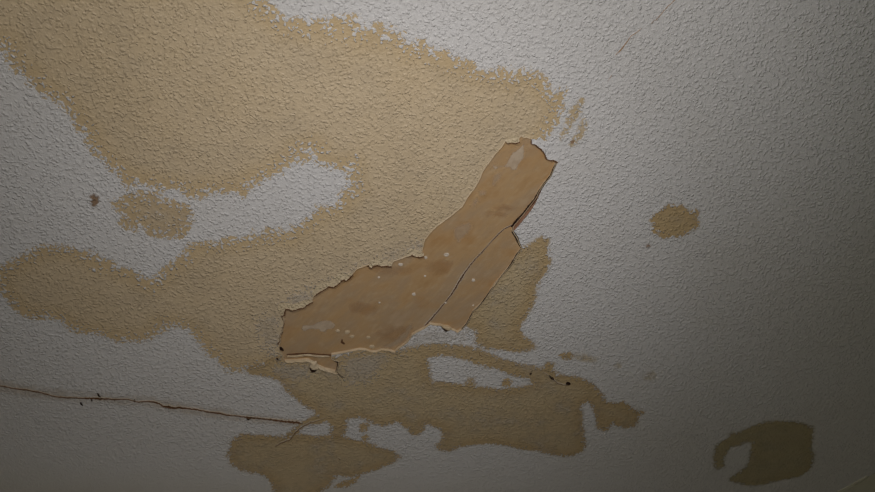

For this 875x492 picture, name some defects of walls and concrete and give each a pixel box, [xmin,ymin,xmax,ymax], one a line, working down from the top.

damp [0,0,645,492]
flaking render [276,135,559,379]
damp [650,204,700,239]
crack [0,385,327,447]
damp [713,421,814,485]